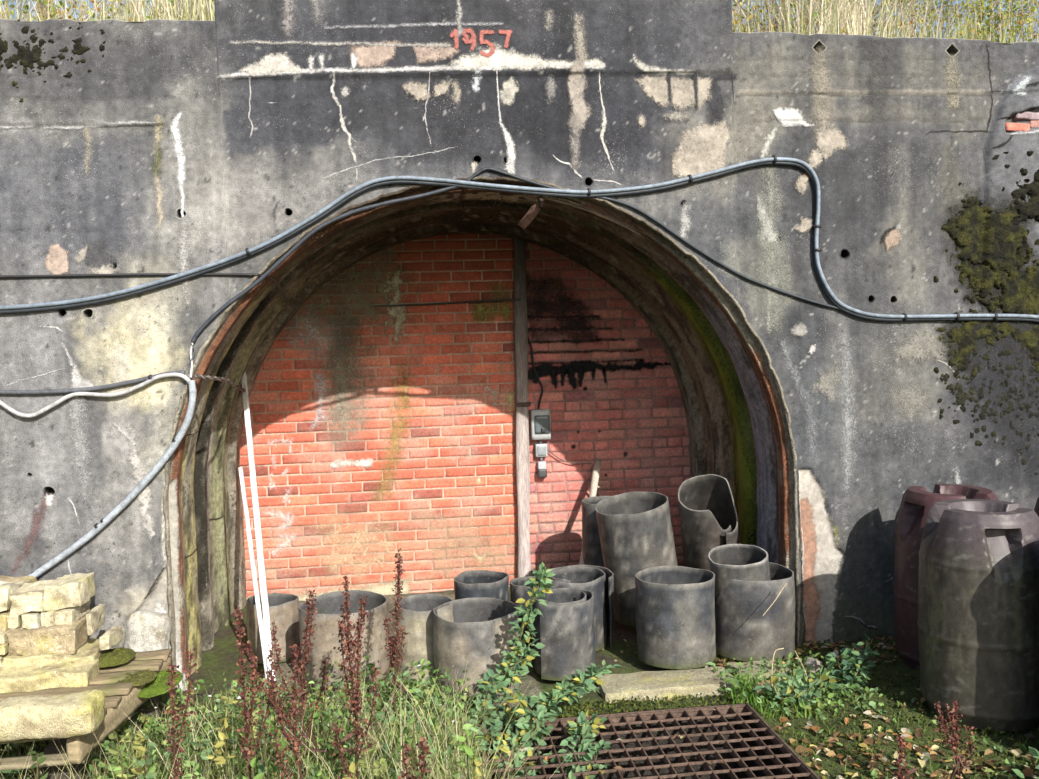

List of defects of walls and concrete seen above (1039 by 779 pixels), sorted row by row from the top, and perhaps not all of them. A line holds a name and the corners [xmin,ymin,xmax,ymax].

peeling [352,40,401,67]
crack [323,71,453,180]
peeling [414,45,457,62]
crack [496,72,516,173]
crack [553,73,622,185]
peeling [638,72,730,178]
peeling [774,108,847,193]
crack [927,45,1039,149]
peeling [796,218,812,232]
damp [528,315,671,380]
corrosion [13,494,54,570]
spalling [798,469,844,644]